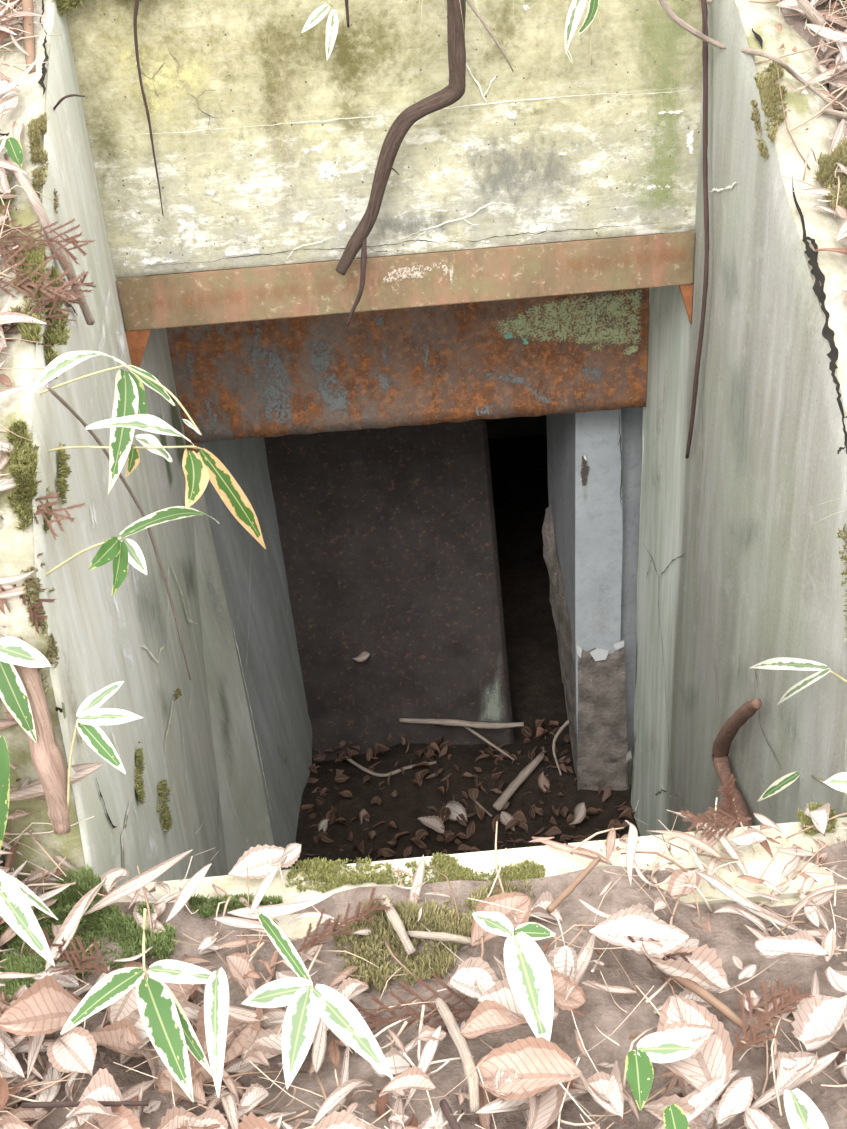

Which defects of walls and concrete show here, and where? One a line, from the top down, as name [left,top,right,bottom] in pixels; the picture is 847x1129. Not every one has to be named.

leakage [303,141,342,182]
leakage [465,150,566,191]
leakage [686,130,695,154]
leakage [123,258,173,266]
leakage [225,248,259,256]
crack [792,175,847,454]